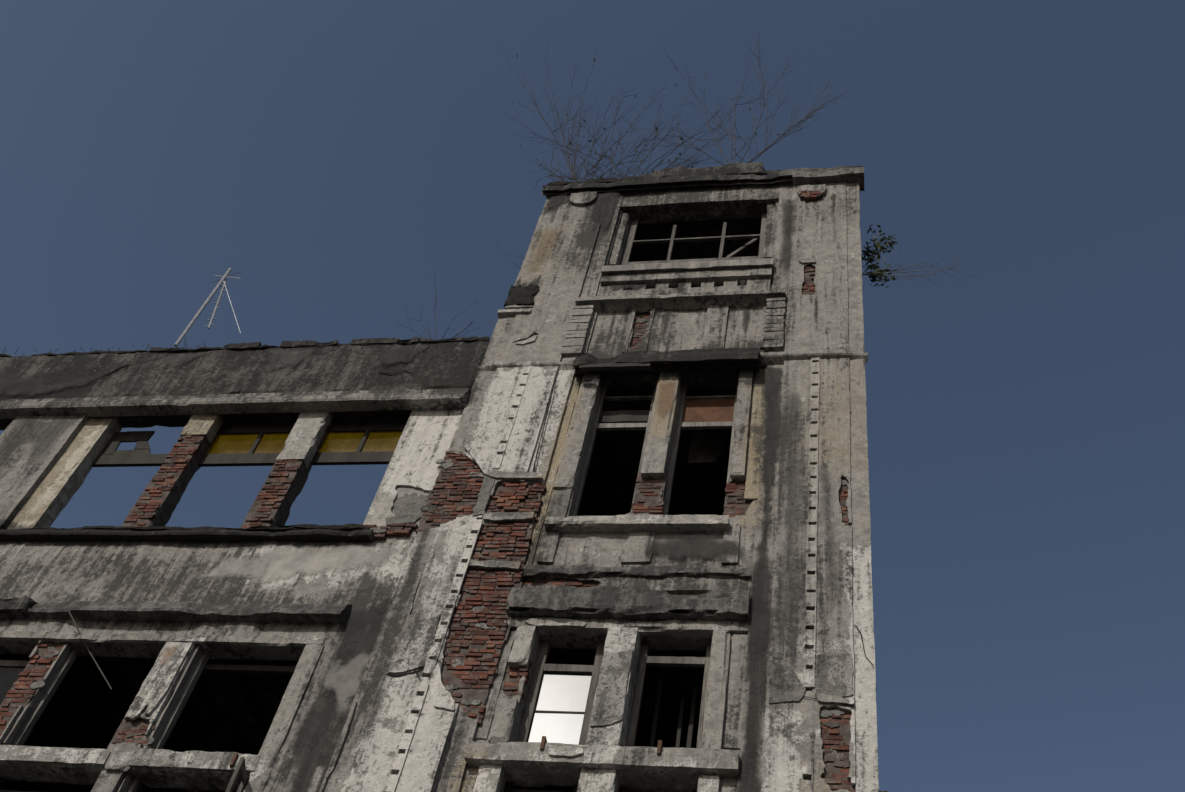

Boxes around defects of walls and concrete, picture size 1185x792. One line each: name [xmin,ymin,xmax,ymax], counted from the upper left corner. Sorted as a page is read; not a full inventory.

flaking render [799,258,816,295]
flaking render [358,444,600,726]
water stain [648,534,743,558]
water stain [737,368,782,792]
flaking render [839,478,851,526]
water stain [291,599,389,792]
flaking render [769,652,856,792]